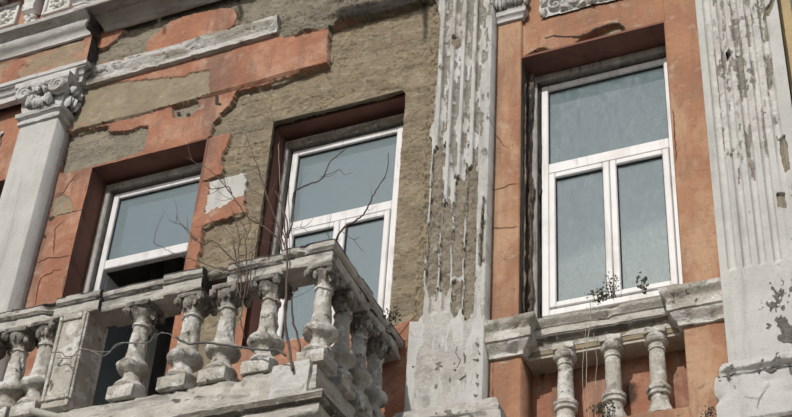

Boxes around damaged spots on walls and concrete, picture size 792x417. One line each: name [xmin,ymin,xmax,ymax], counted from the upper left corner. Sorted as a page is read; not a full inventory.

spalling [95,0,329,66]
peeling [60,70,211,174]
peeling [712,0,775,184]
peeling [761,55,790,173]
spalling [197,0,493,327]
peeling [51,194,73,217]
spalling [776,192,787,209]
crack [35,209,93,304]
spalling [194,306,220,378]
peeling [756,352,792,373]
peeling [759,279,792,344]